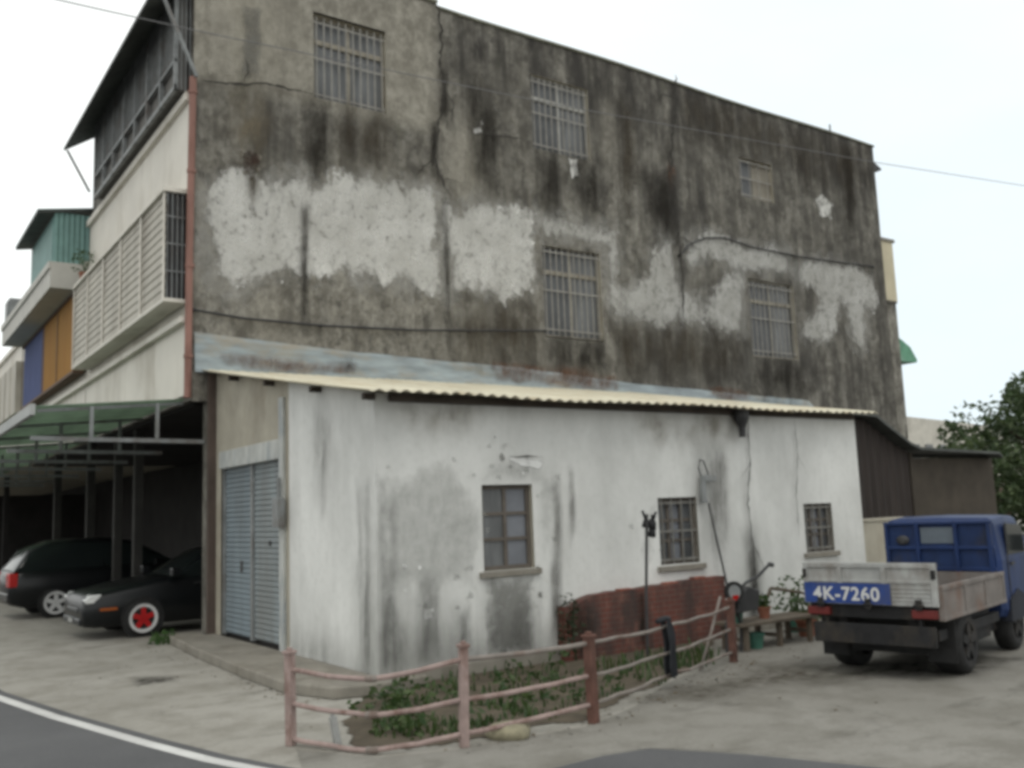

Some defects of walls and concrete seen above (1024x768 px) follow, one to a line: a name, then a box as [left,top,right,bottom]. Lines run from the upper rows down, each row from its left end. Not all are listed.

crack [415,4,454,197]
peeling [206,150,787,334]
peeling [816,195,833,217]
peeling [799,260,878,347]
crack [740,422,764,616]